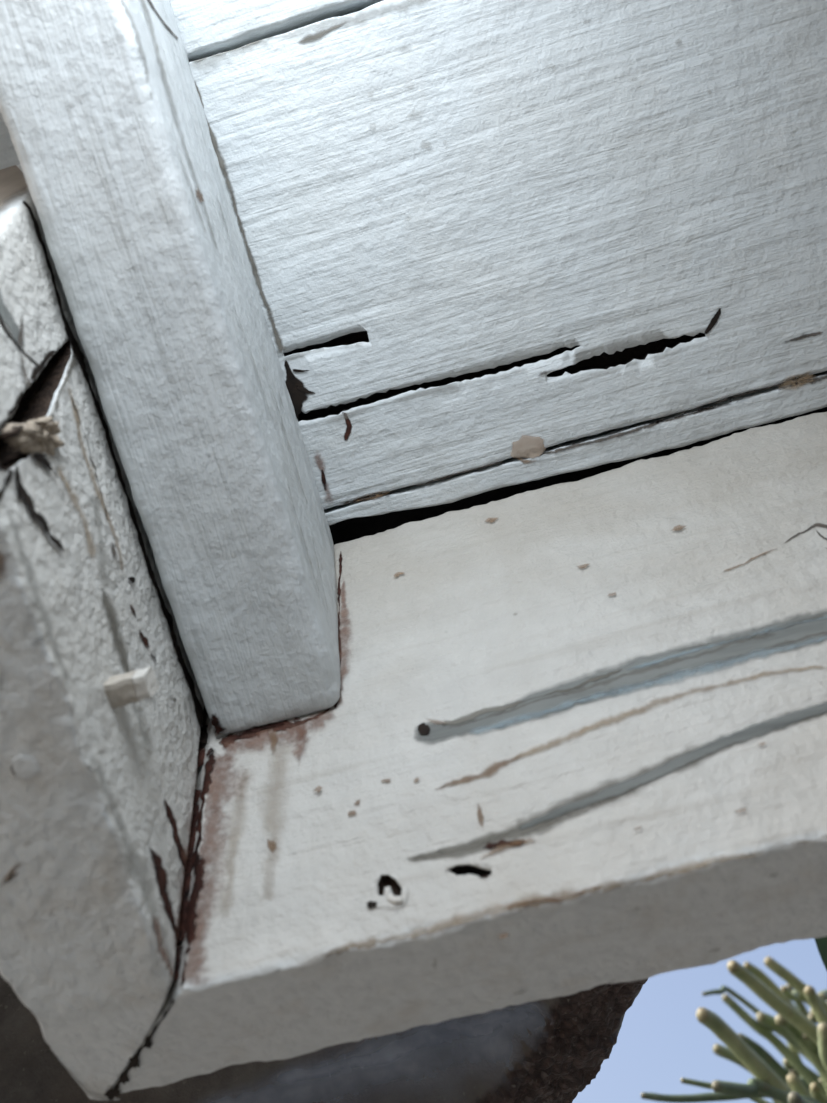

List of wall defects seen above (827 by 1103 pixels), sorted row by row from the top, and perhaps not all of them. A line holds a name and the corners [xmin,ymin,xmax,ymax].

crack [785,332,822,342]
crack [284,308,721,422]
crack [541,375,827,455]
peeling [511,435,546,463]
crack [417,462,502,486]
crack [343,492,390,504]
damp [416,611,827,742]
damp [409,702,827,861]
peeling [366,875,404,909]